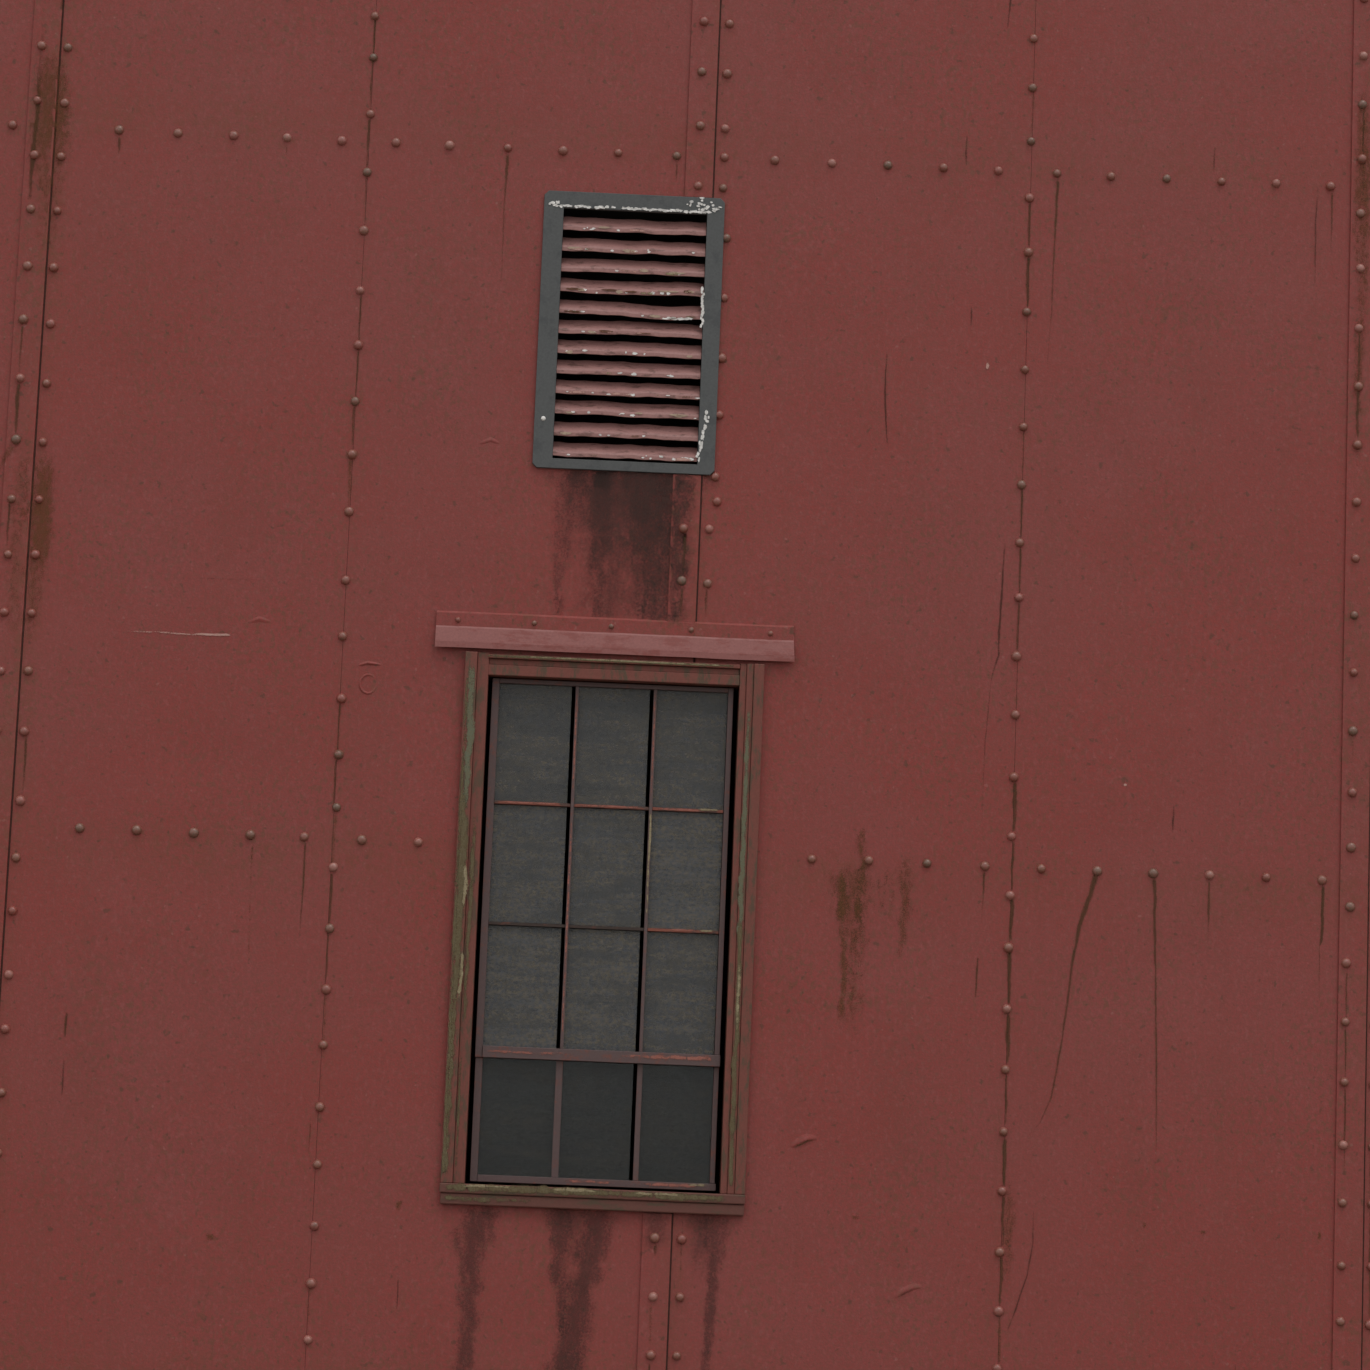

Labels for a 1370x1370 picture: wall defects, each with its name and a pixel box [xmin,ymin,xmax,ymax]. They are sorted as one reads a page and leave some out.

rust [30,58,68,202]